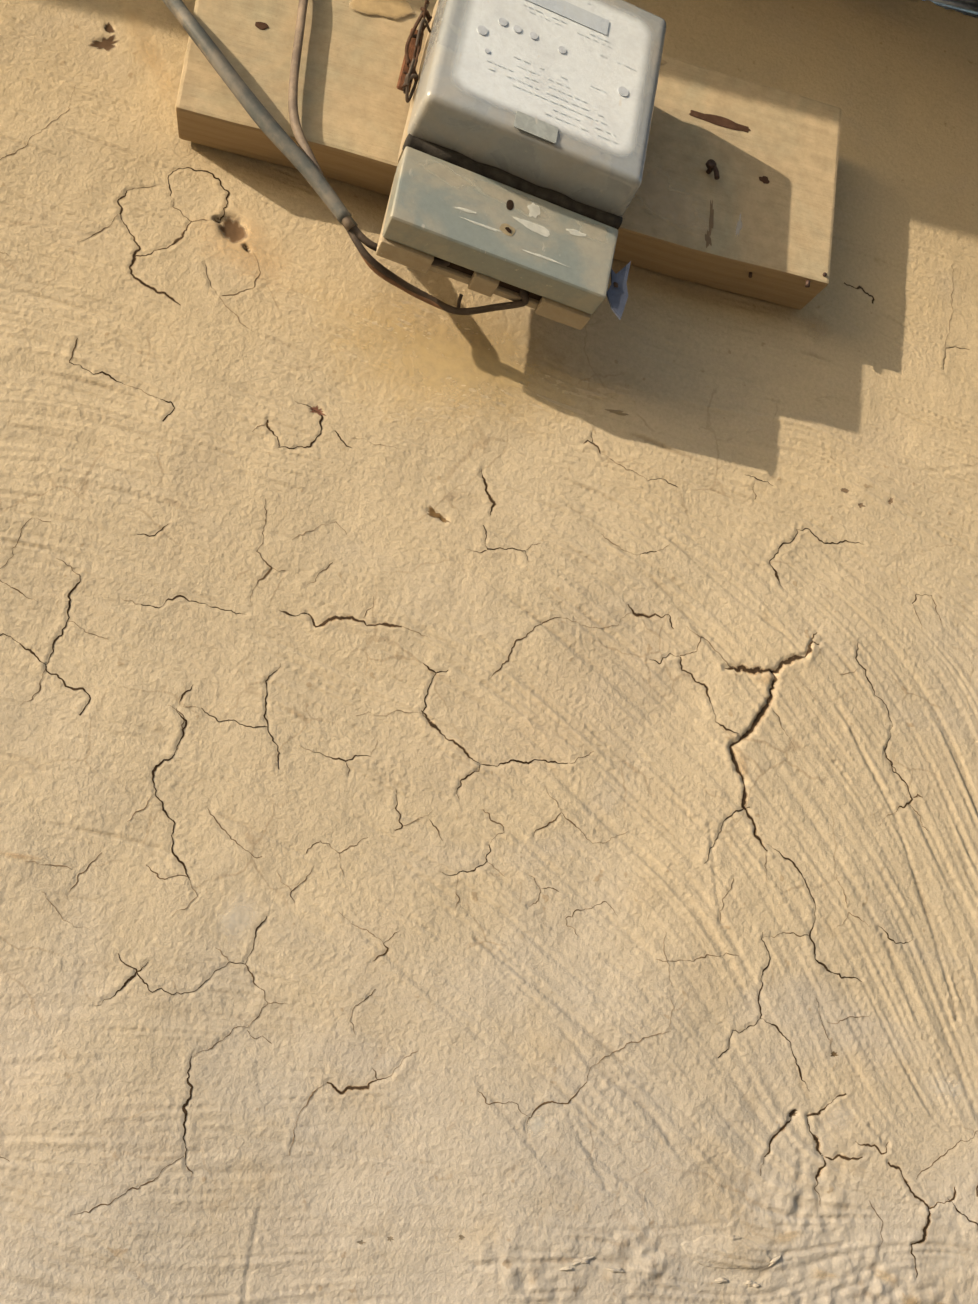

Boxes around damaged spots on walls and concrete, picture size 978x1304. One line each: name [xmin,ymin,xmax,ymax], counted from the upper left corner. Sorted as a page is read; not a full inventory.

crack [80,167,230,305]
crack [205,250,261,327]
crack [69,338,175,422]
crack [252,401,401,449]
crack [583,432,677,487]
crack [468,470,540,562]
crack [769,528,861,588]
crack [0,519,106,716]
crack [27,853,101,928]
crack [74,500,625,1215]
crack [478,604,978,1278]